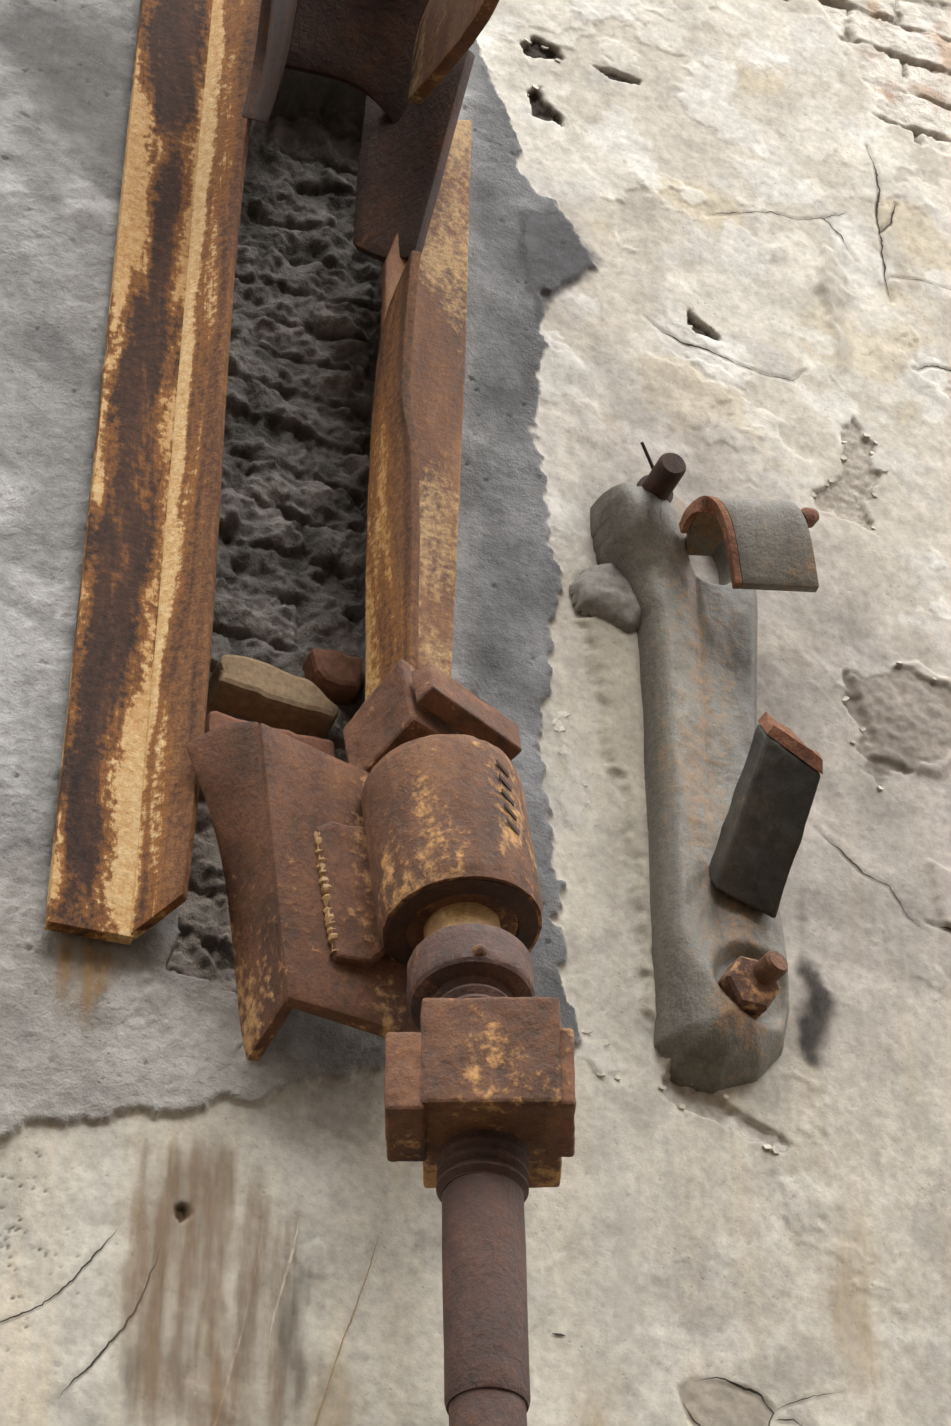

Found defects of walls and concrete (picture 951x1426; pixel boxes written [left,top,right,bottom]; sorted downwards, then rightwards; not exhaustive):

flaking render [817,0,951,163]
crack [714,149,951,299]
crack [652,323,806,381]
crack [824,836,951,931]
rust [136,1163,178,1287]
peeling [175,1208,187,1223]
rust [197,1351,238,1426]